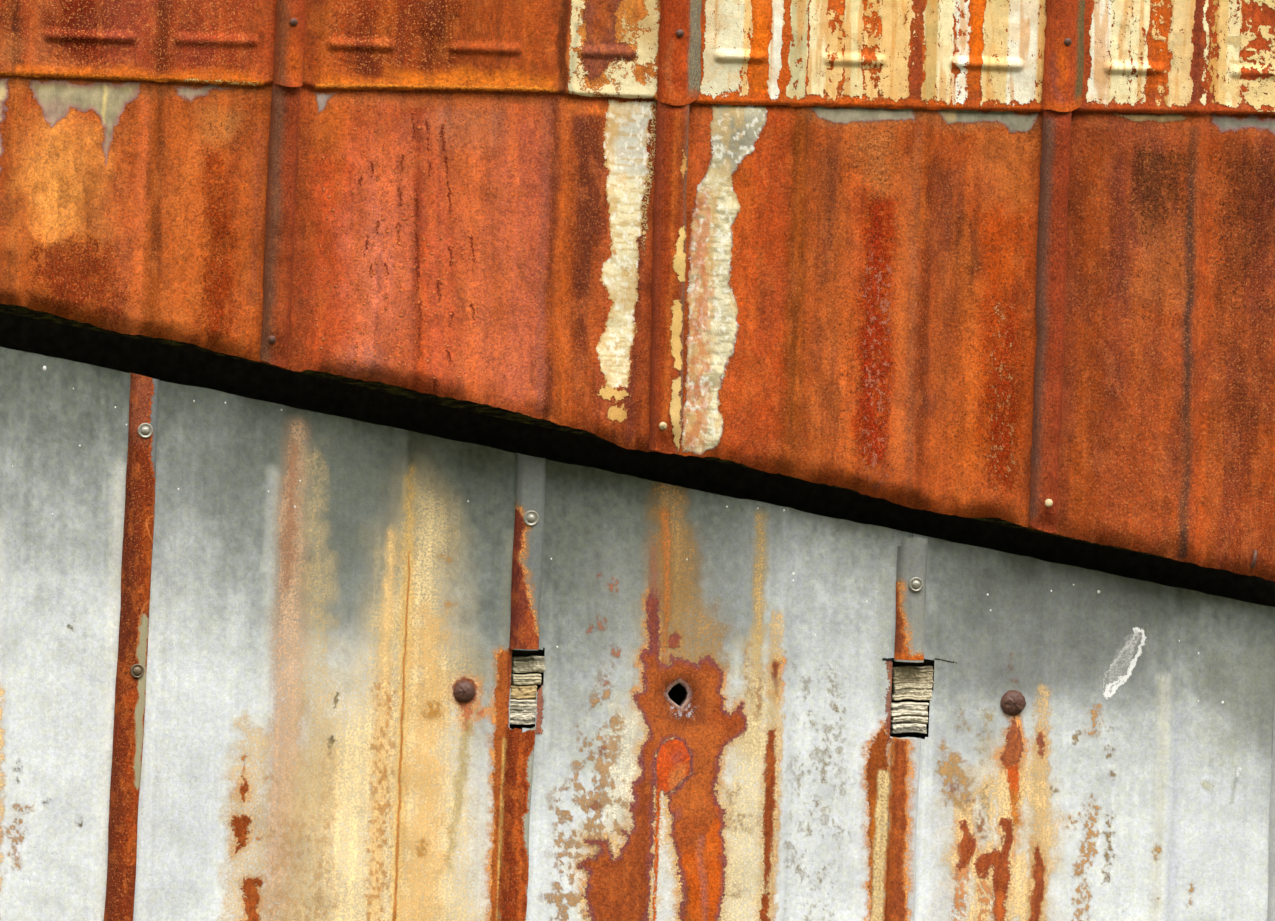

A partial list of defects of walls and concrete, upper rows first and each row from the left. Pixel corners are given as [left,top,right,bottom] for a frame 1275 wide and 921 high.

peeling [0,77,11,174]
peeling [29,79,141,167]
peeling [175,84,232,102]
corrosion [313,81,558,93]
peeling [568,0,660,425]
peeling [669,0,1047,491]
peeling [1086,0,1275,136]
corrosion [104,373,156,921]
corrosion [222,420,544,921]
corrosion [575,483,786,921]
corrosion [863,582,924,921]
corrosion [943,685,1060,921]